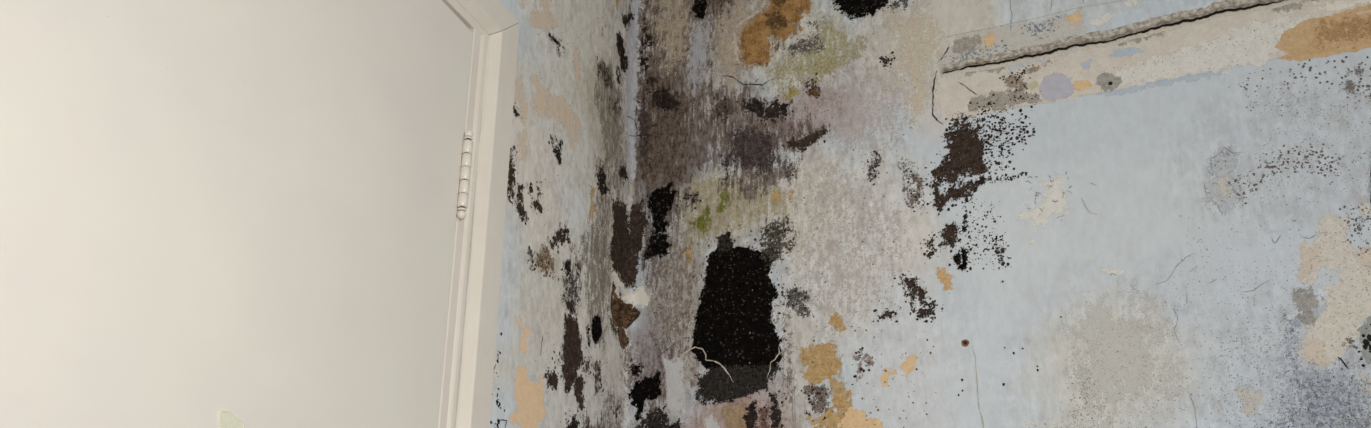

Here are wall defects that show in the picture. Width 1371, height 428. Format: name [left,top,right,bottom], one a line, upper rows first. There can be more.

crack [921,0,1304,124]
flaking render [934,0,1371,122]
water stain [507,0,1036,428]
water stain [1035,56,1371,428]
peeling [1291,202,1371,368]
crack [1363,156,1371,217]
peeling [510,317,546,428]
peeling [879,355,918,387]